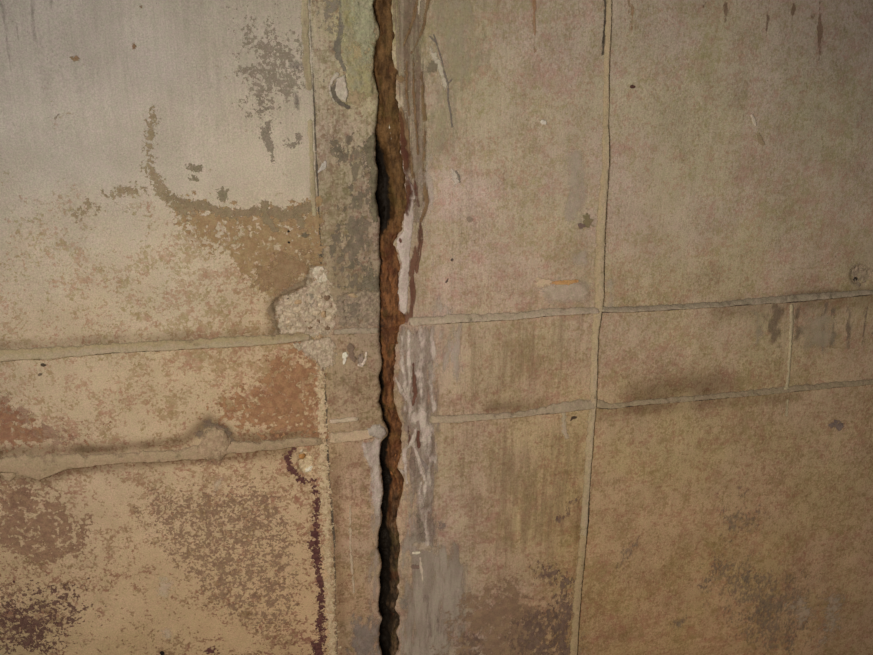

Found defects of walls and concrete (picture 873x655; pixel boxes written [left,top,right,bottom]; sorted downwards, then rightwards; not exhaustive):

leakage [71,106,380,297]
spalling [268,266,380,371]
crack [373,0,407,655]
corrosion [396,0,430,322]
leakage [396,323,581,655]